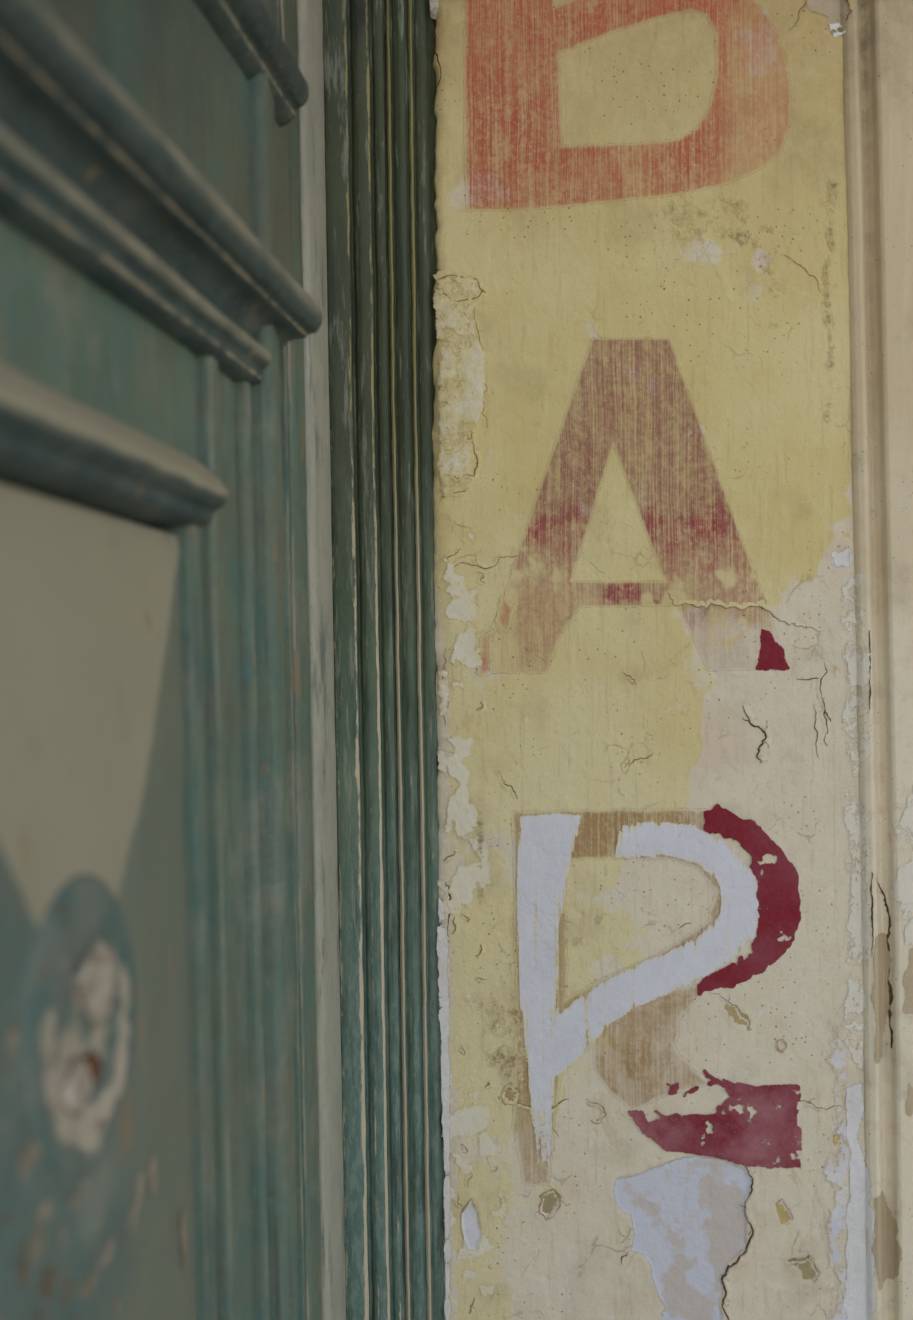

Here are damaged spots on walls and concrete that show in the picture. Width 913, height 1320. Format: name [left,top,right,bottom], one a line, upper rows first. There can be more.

spalling [792,0,855,37]
crack [454,552,521,569]
spalling [436,521,485,715]
crack [667,592,820,631]
crack [742,705,773,764]
crack [796,662,831,759]
spalling [437,701,508,1320]
spalling [614,1156,751,1320]
crack [721,1166,760,1320]